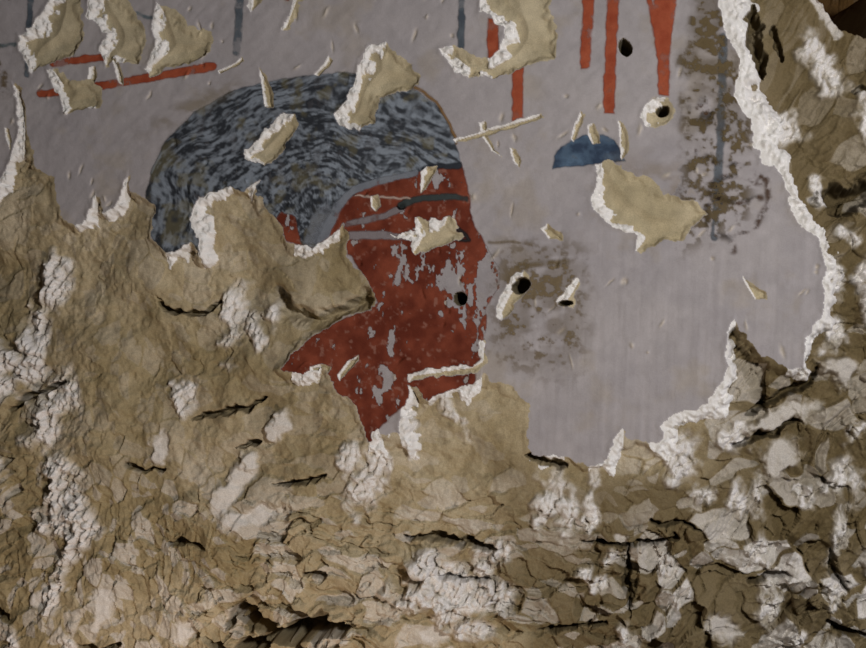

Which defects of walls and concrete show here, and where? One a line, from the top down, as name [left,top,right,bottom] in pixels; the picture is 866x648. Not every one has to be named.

flaking render [19,0,214,116]
flaking render [334,42,421,131]
flaking render [439,0,558,79]
flaking render [591,121,708,254]
flaking render [0,69,376,510]
crack [159,298,223,317]
flaking render [389,209,464,286]
peeling [408,246,499,384]
flaking render [623,0,866,535]
crack [9,381,69,412]
crack [192,396,268,421]
flaking render [0,310,866,648]